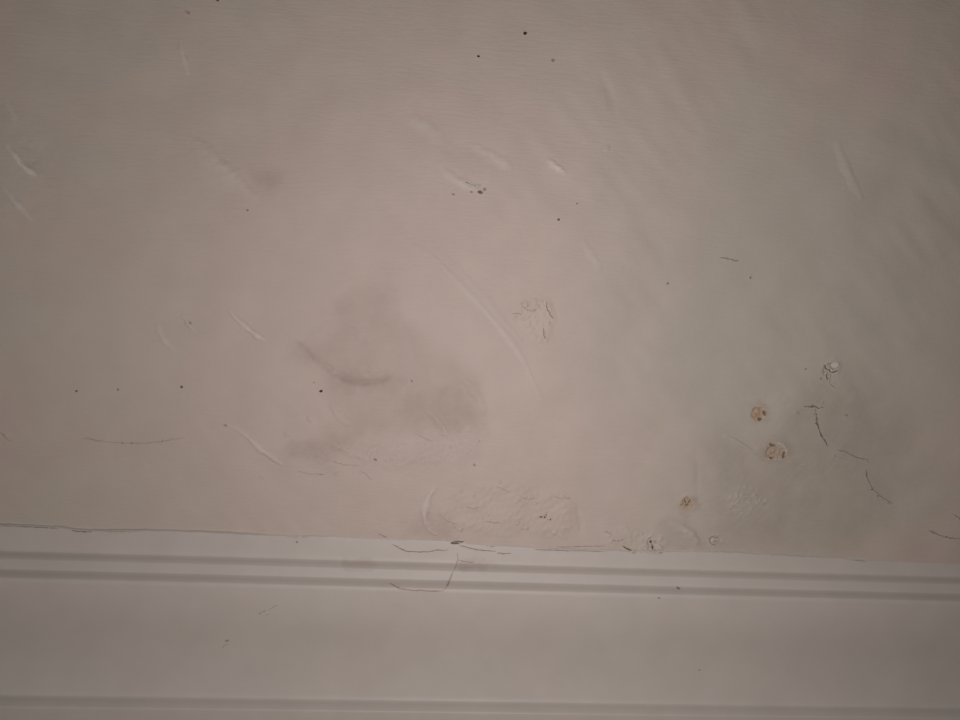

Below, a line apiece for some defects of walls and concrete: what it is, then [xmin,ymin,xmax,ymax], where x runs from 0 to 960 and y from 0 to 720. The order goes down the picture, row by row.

crack [794,401,894,505]
crack [379,533,511,593]